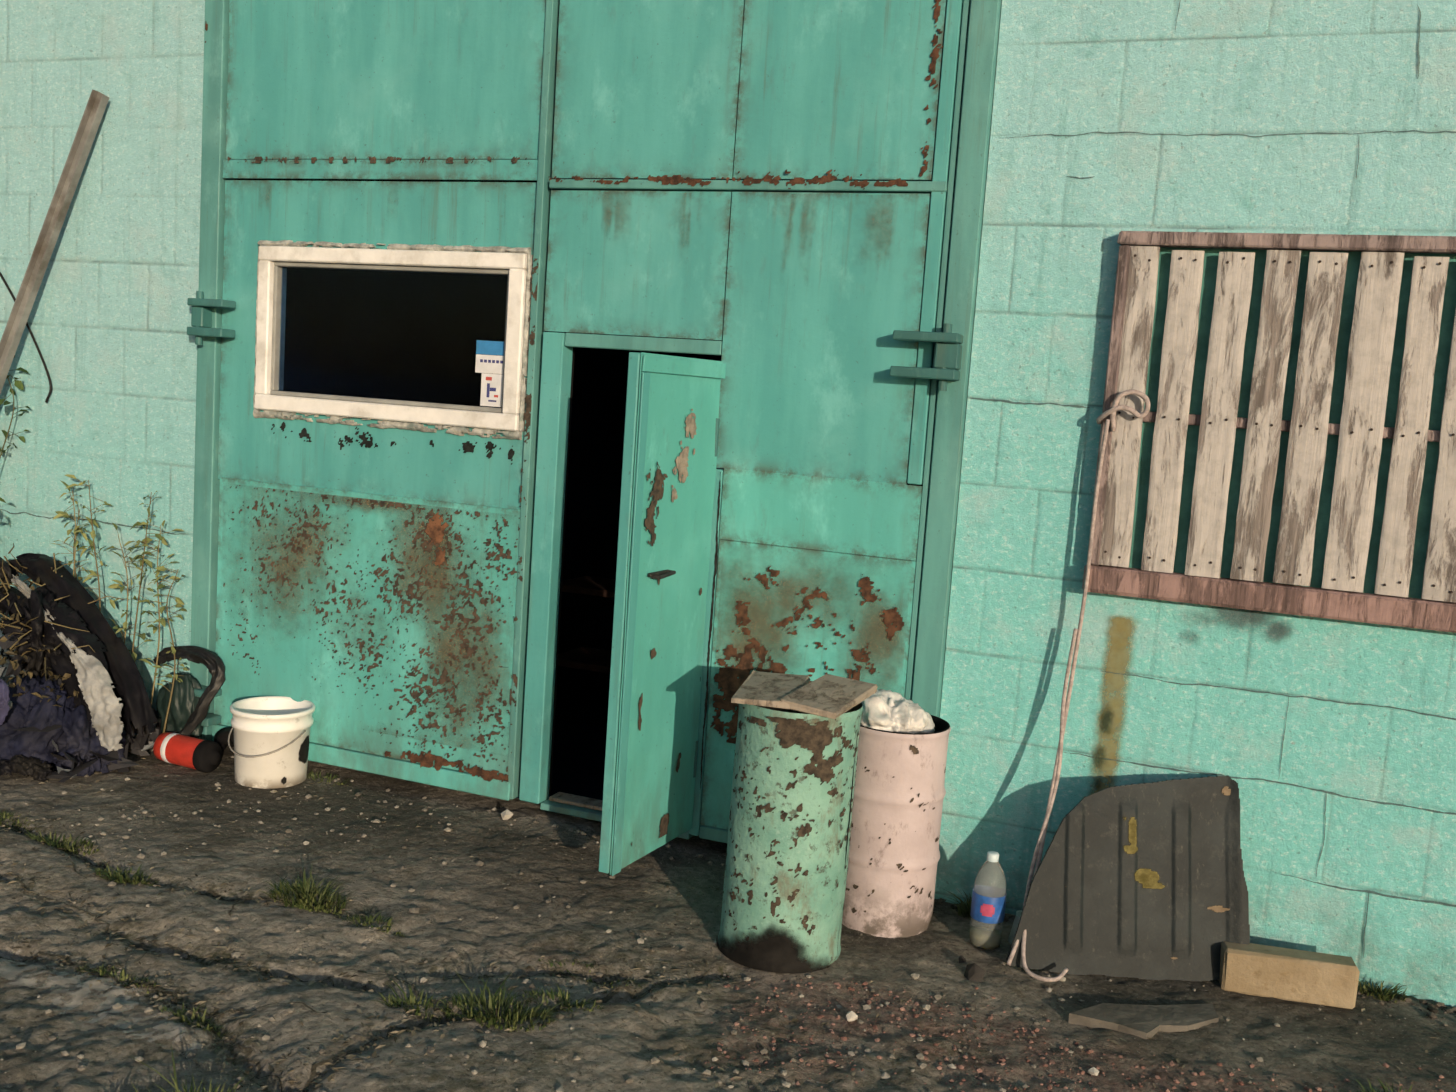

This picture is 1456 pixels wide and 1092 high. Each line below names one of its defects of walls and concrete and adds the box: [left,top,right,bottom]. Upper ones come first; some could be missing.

corrosion [228,156,529,164]
corrosion [549,0,943,190]
corrosion [220,258,539,782]
corrosion [645,462,668,546]
corrosion [700,566,904,744]
water stain [1092,617,1135,794]
corrosion [659,813,669,838]
crack [0,822,716,1092]